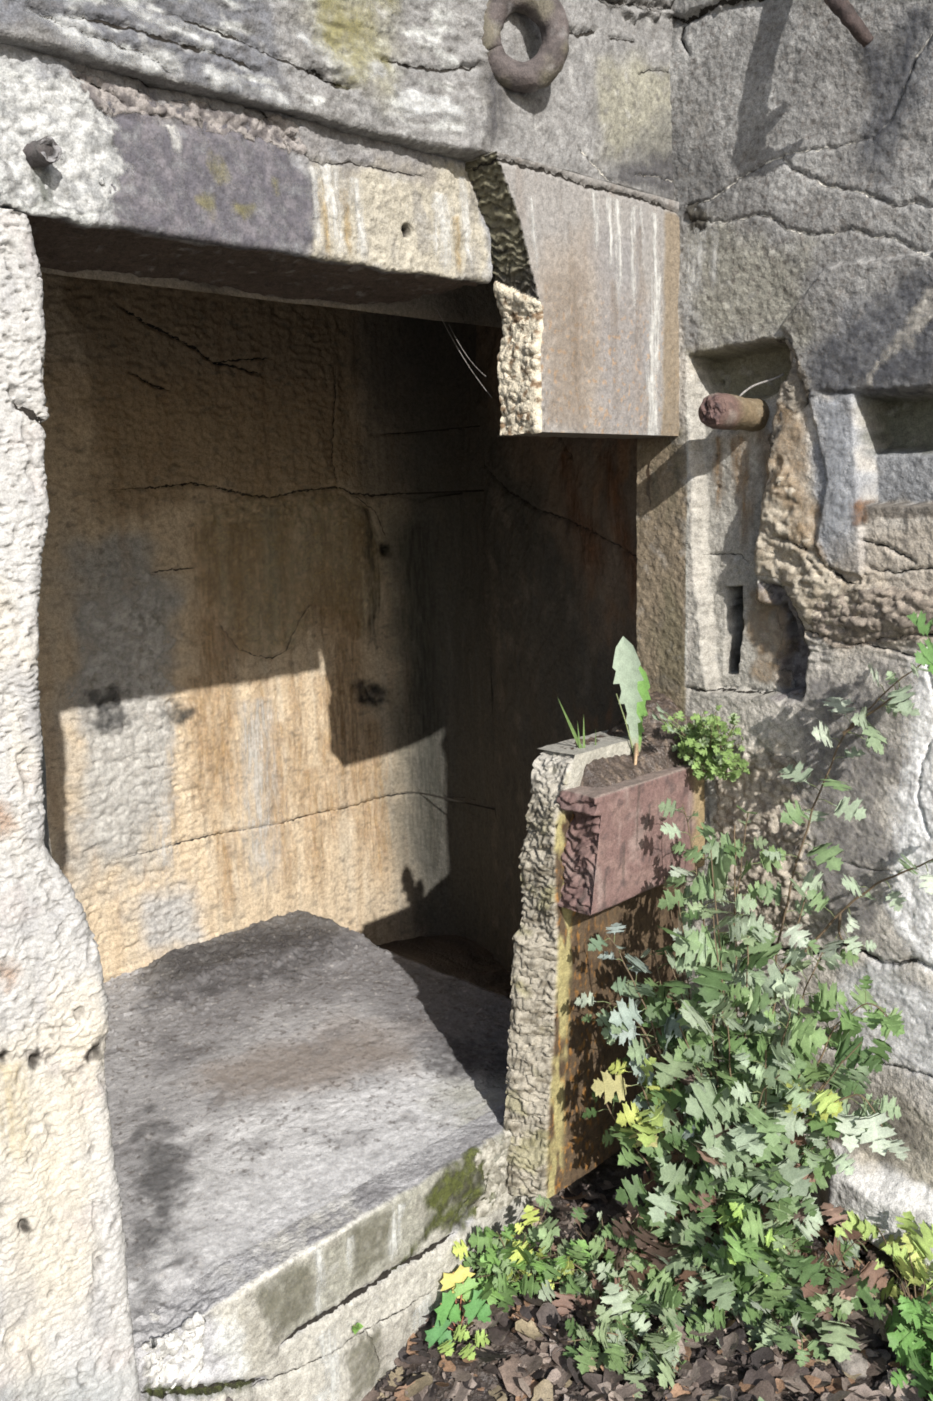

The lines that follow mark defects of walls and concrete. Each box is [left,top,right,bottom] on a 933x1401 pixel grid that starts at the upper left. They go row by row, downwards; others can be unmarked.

crack [467,32,933,257]
crack [116,303,270,376]
crack [112,368,637,556]
crack [151,566,195,574]
crack [114,792,495,860]
crack [141,1232,455,1399]